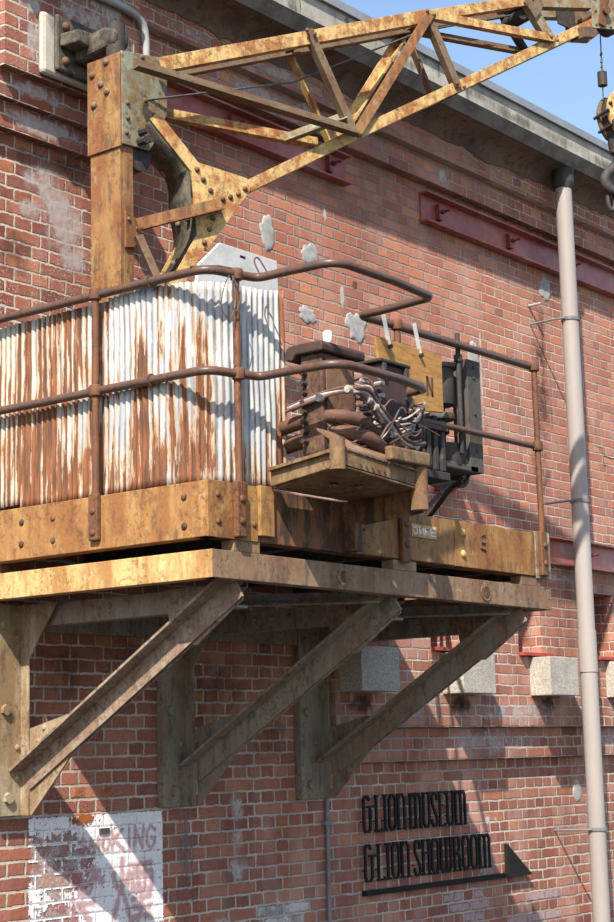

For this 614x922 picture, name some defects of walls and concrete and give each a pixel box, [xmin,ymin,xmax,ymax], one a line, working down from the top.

peeling [28,837,63,875]